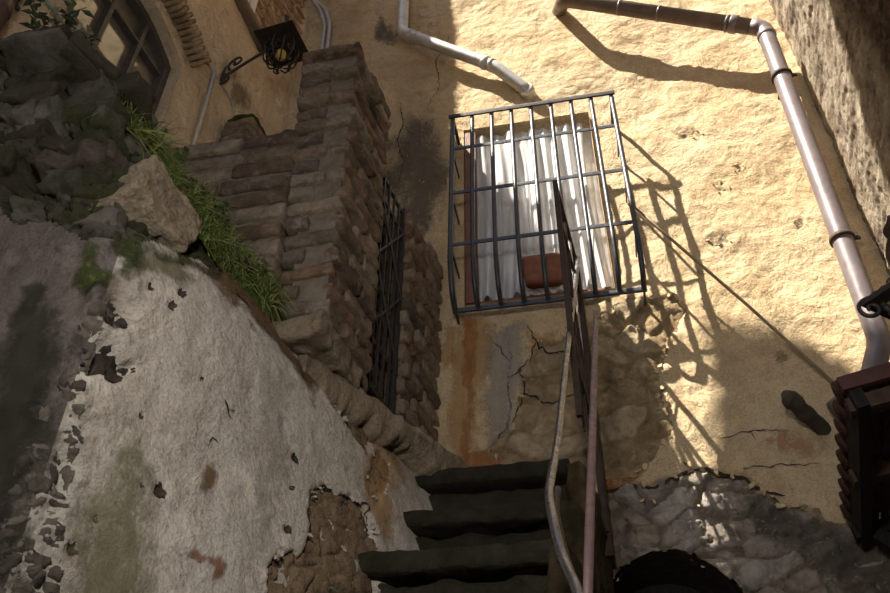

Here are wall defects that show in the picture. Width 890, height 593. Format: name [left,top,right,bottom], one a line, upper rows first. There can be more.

leakage [376,18,397,41]
crack [396,103,414,180]
leakage [382,121,449,235]
flaking render [0,293,136,593]
flaking render [267,405,392,593]
corrosion [441,317,501,467]
crack [489,325,578,439]
flaking render [490,291,890,593]
crack [718,429,781,439]